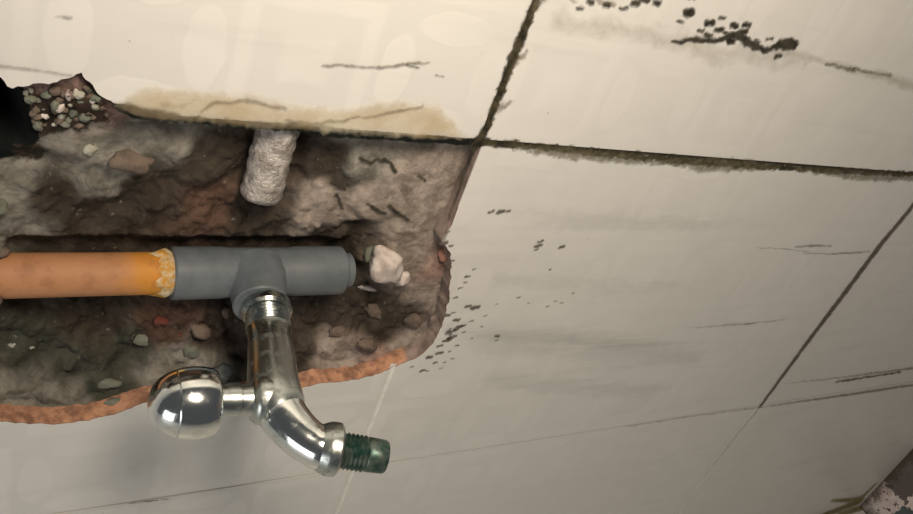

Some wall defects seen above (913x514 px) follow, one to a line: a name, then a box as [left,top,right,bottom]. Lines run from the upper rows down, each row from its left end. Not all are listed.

water stain [125,95,454,135]
water stain [471,0,913,181]
spalling [0,73,481,387]
spalling [0,295,248,424]
water stain [824,485,875,514]